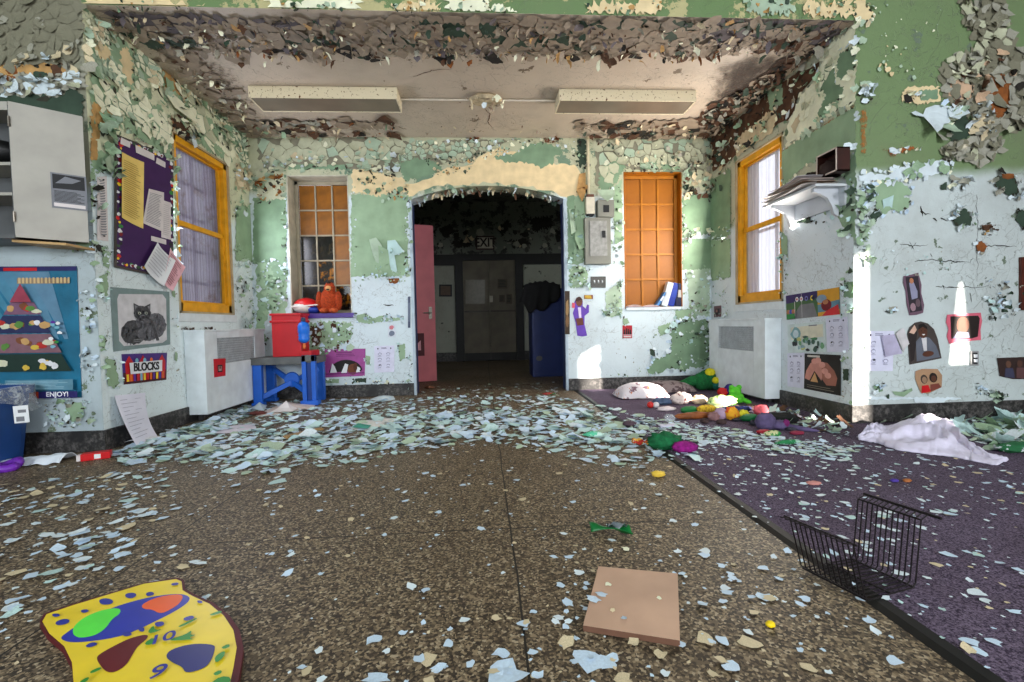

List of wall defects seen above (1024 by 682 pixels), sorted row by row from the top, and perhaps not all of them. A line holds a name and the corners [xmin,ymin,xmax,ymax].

peeling [0,0,1024,389]
crack [902,203,1016,302]
peeling [840,344,853,405]